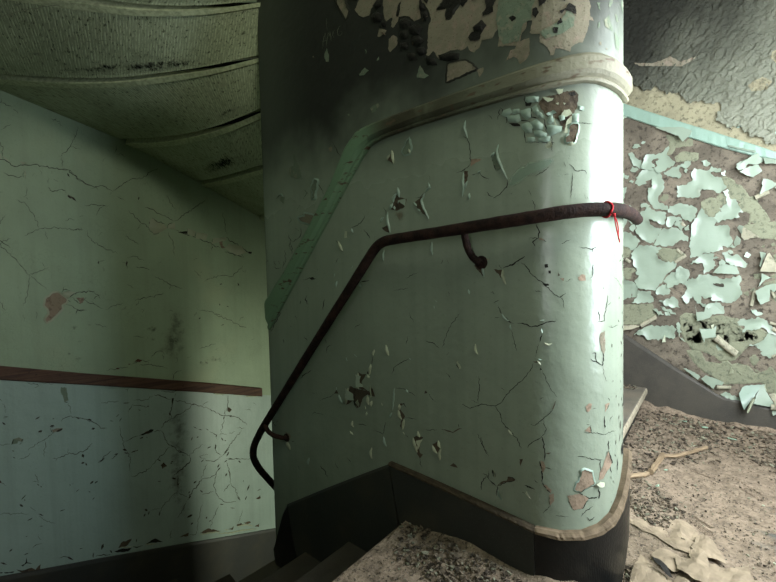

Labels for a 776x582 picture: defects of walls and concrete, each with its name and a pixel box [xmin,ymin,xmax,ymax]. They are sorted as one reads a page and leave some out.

peeling [335,0,623,83]
peeling [563,122,580,146]
crack [529,156,622,328]
peeling [36,289,100,324]
crack [491,264,566,350]
peeling [323,350,387,447]
crack [462,364,556,460]
crack [4,394,261,530]
peeling [568,420,624,510]